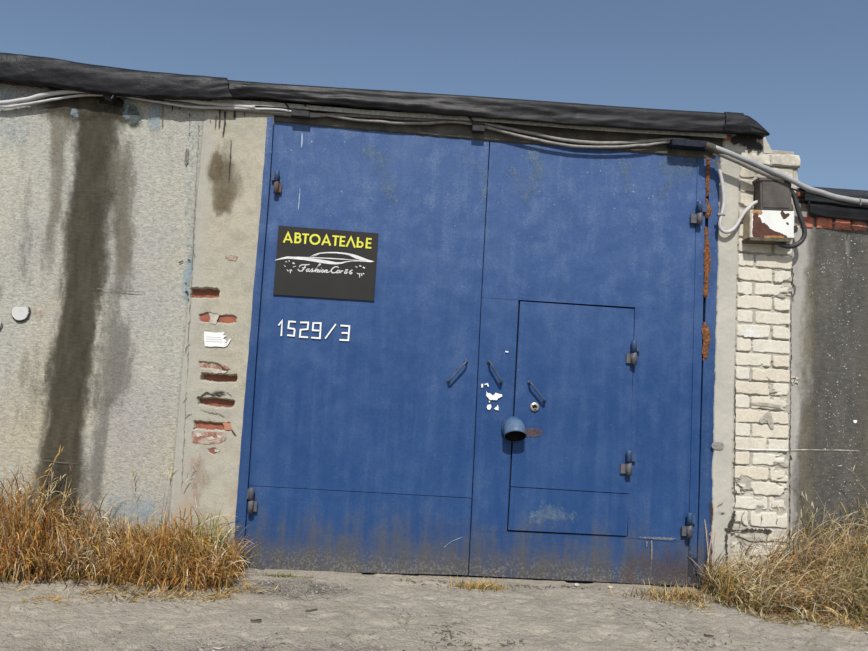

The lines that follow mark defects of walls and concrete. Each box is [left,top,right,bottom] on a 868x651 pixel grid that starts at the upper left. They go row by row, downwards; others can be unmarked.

damp [209,146,237,212]
damp [30,93,138,534]
flaking render [200,313,237,324]
flaking render [192,362,238,454]
damp [796,218,868,570]